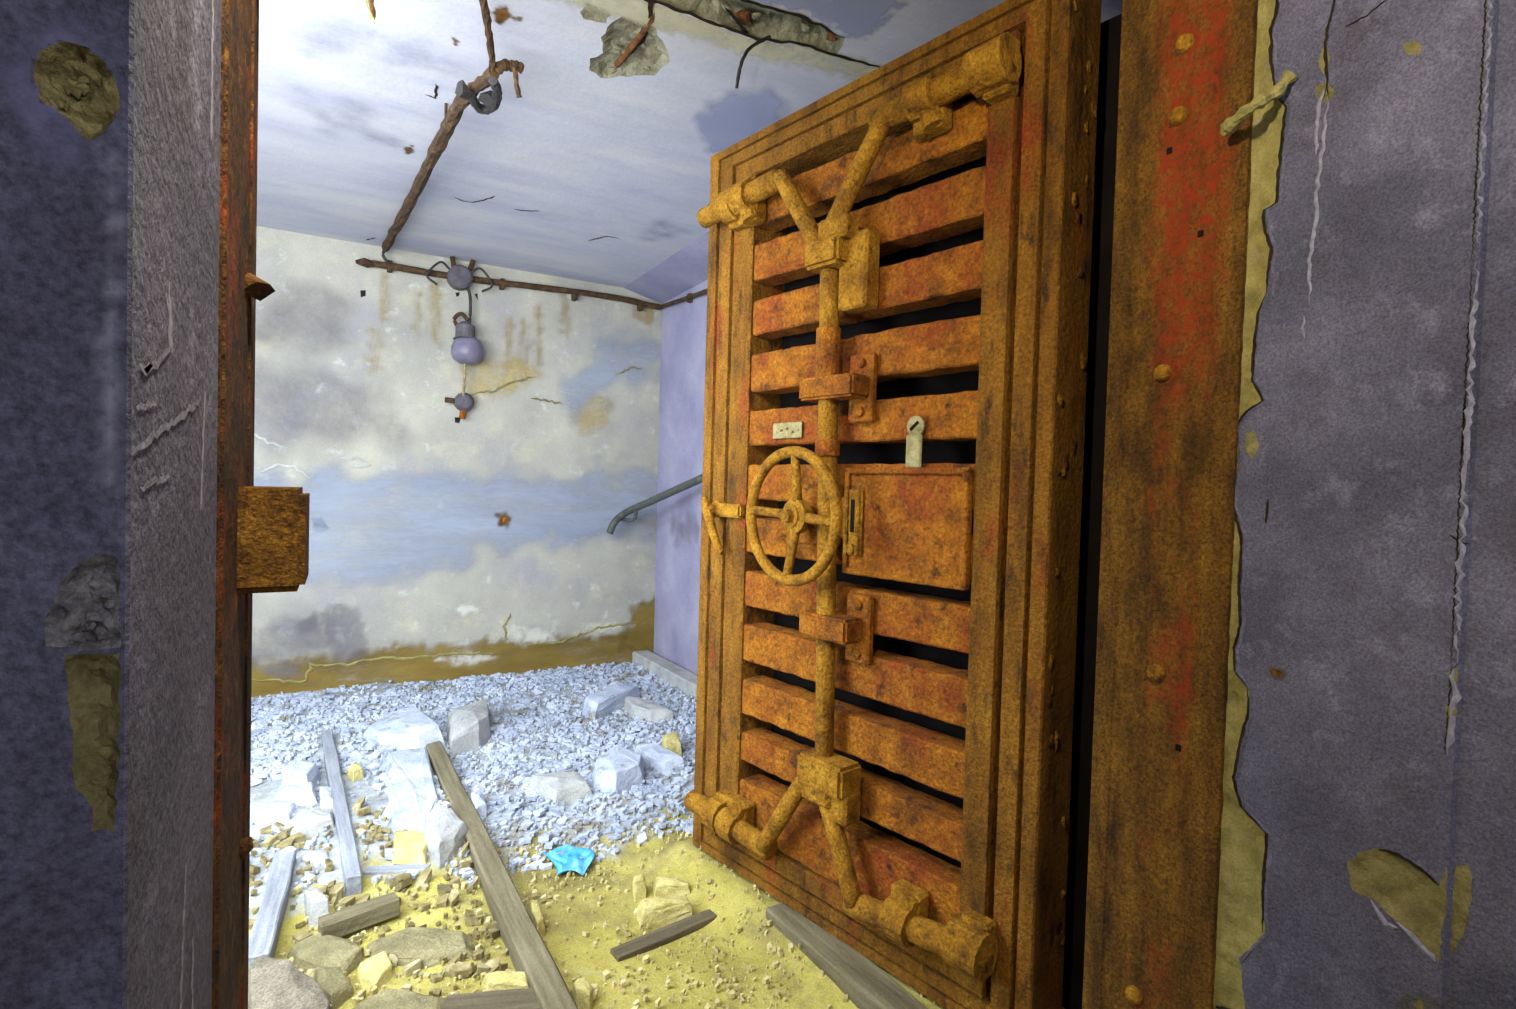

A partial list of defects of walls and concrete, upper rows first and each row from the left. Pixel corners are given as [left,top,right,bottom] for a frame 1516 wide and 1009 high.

spalling [11,32,120,142]
spalling [580,0,670,78]
peeling [751,0,902,38]
crack [1301,0,1386,338]
spalling [1213,0,1290,1009]
spalling [44,554,122,831]
water stain [251,598,655,697]
peeling [1347,848,1473,962]